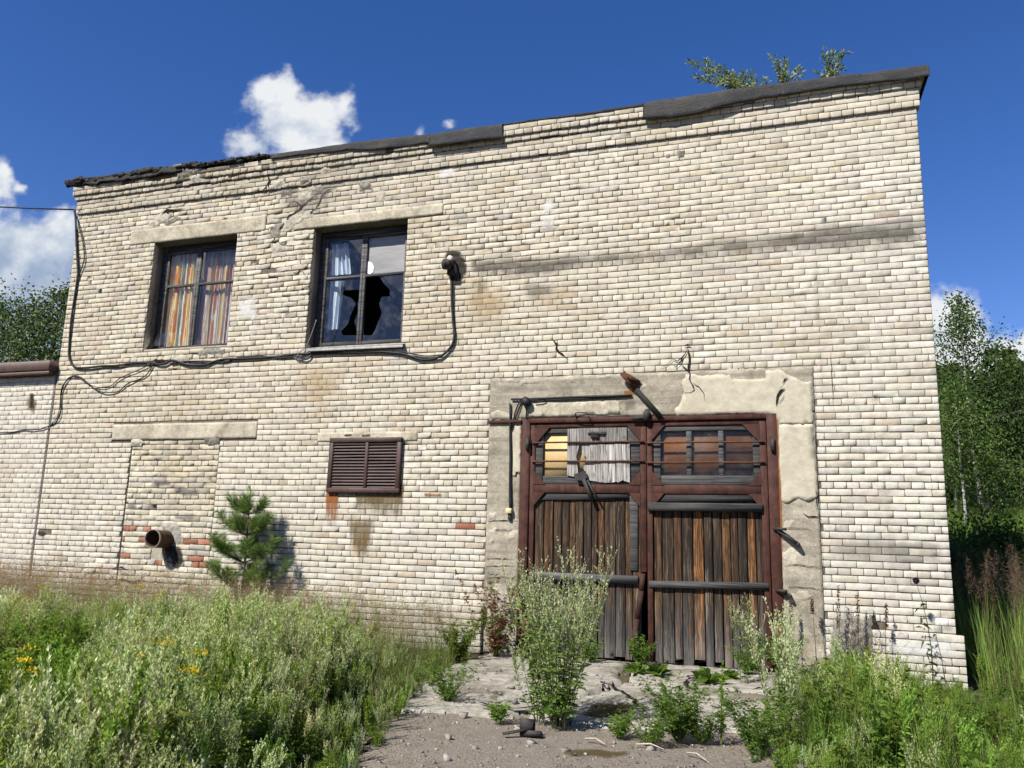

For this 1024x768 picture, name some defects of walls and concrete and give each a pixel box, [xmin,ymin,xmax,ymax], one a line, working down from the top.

crack [266,186,335,248]
crack [665,344,705,399]
peeling [674,367,819,504]
rust [326,484,403,551]